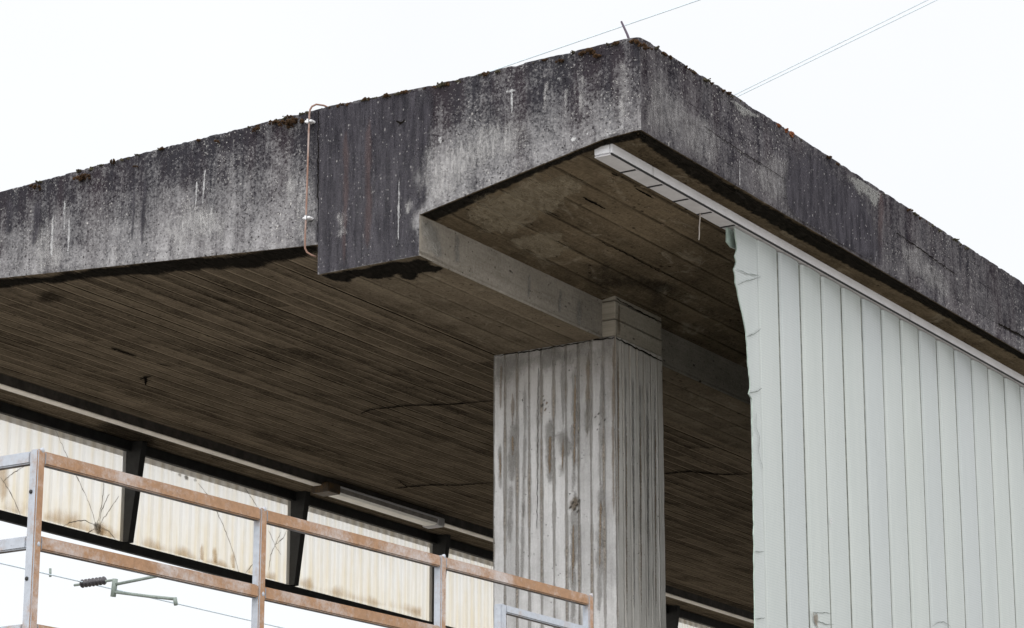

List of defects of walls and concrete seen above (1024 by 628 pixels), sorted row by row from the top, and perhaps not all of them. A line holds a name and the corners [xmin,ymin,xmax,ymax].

water stain [32,202,70,256]
water stain [131,178,146,242]
water stain [310,91,510,274]
water stain [786,153,882,264]
crack [55,430,119,539]
crack [198,483,286,574]
crack [363,400,494,413]
crack [395,480,485,489]
water stain [497,350,578,577]
water stain [625,379,657,606]
crack [664,388,763,475]